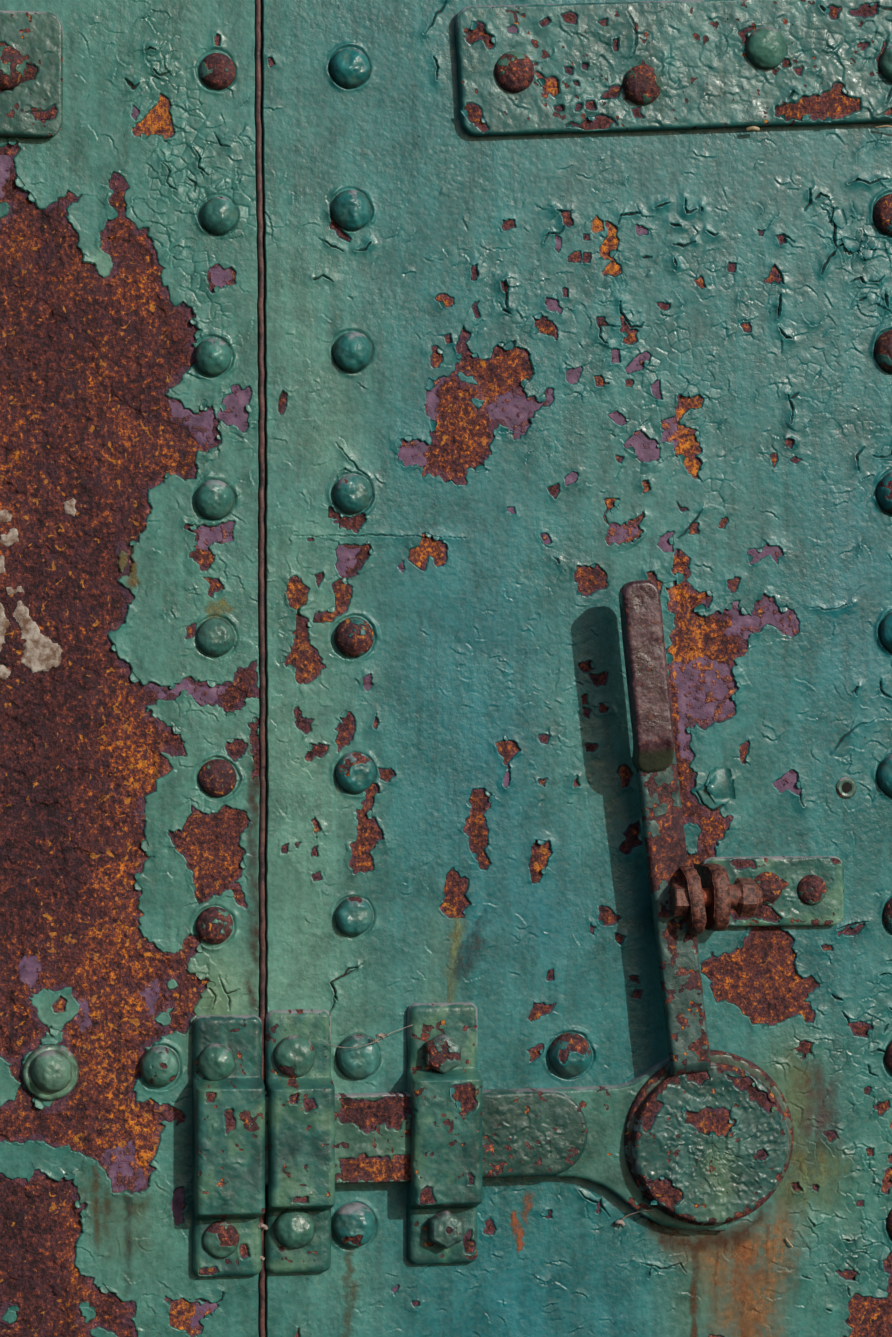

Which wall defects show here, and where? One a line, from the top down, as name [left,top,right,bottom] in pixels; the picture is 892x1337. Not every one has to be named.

crack [125,48,169,90]
rust [775,83,861,123]
crack [166,139,223,190]
crack [805,179,887,305]
peeling [608,380,703,479]
peeling [184,521,235,597]
rust [0,139,259,1217]
peeling [646,503,801,869]
crack [329,967,357,1013]
rust [681,1106,735,1137]
rust [648,1176,786,1337]
peeling [164,1291,223,1337]